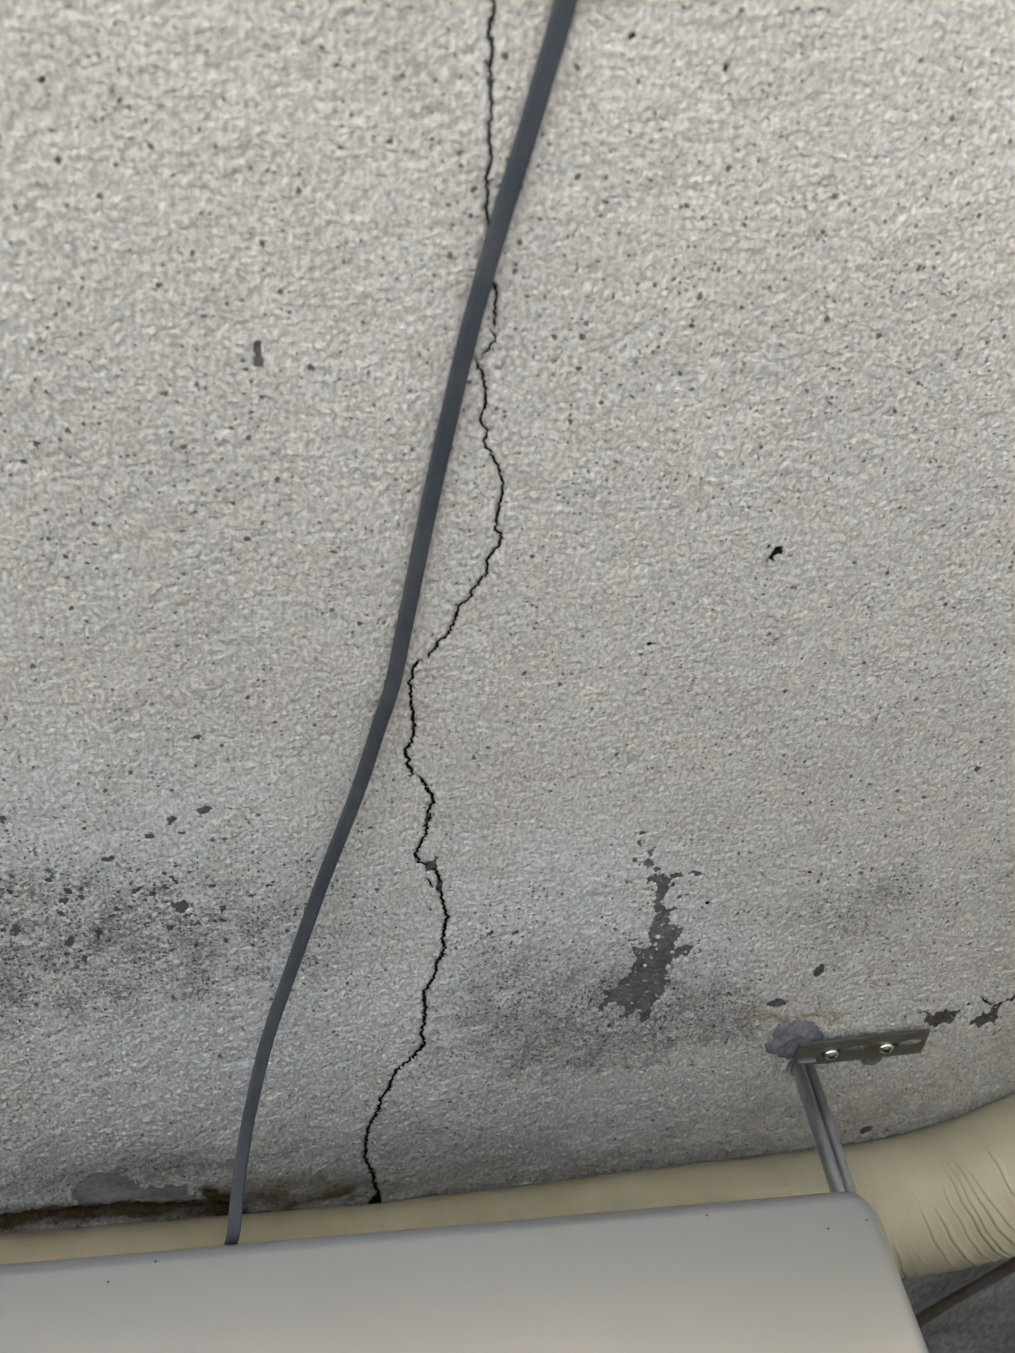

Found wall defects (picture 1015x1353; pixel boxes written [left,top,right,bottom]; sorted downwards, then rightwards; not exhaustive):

crack [482,0,496,228]
crack [363,282,505,1204]
peeling [919,995,1015,1035]